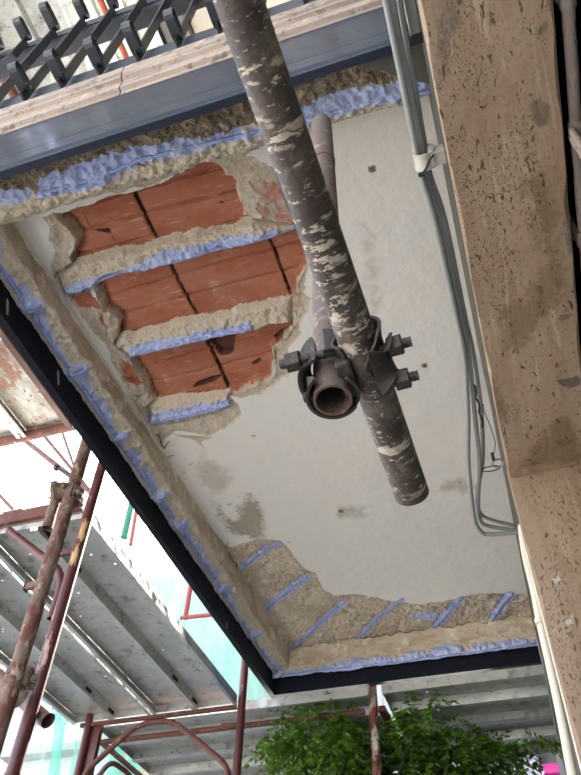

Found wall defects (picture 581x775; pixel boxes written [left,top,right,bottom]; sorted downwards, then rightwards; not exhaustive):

spalling [294,66,399,107]
spalling [0,100,537,678]
damp [227,502,262,537]